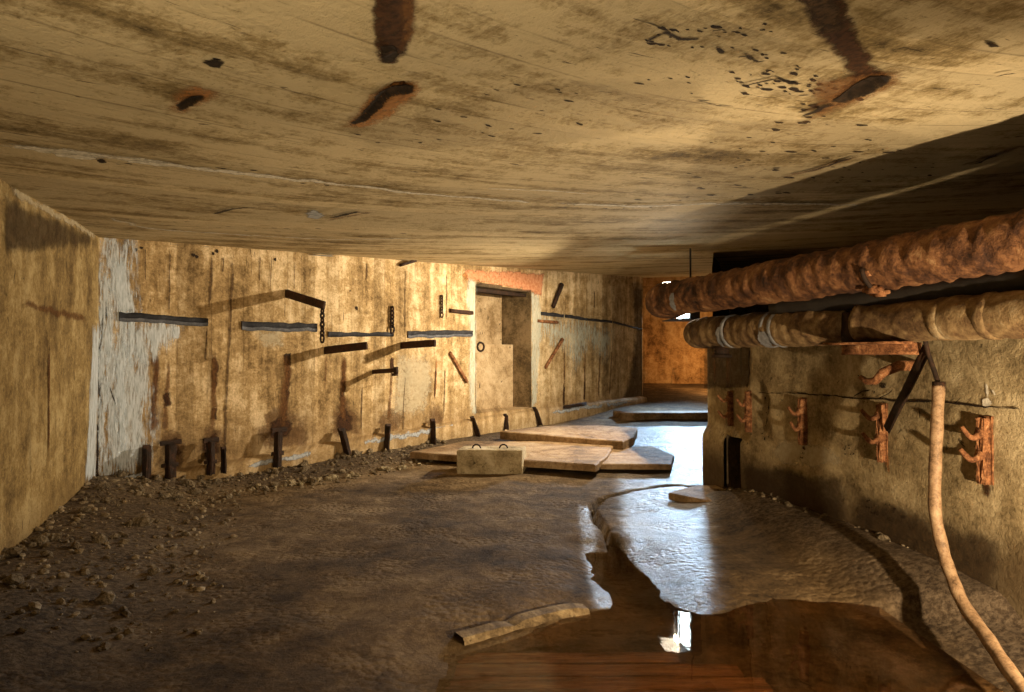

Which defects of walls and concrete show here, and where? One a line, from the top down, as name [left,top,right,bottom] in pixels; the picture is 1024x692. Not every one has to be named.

corrosion [372,0,414,64]
corrosion [798,0,886,78]
damp [6,204,180,478]
efflorescence [249,452,311,468]